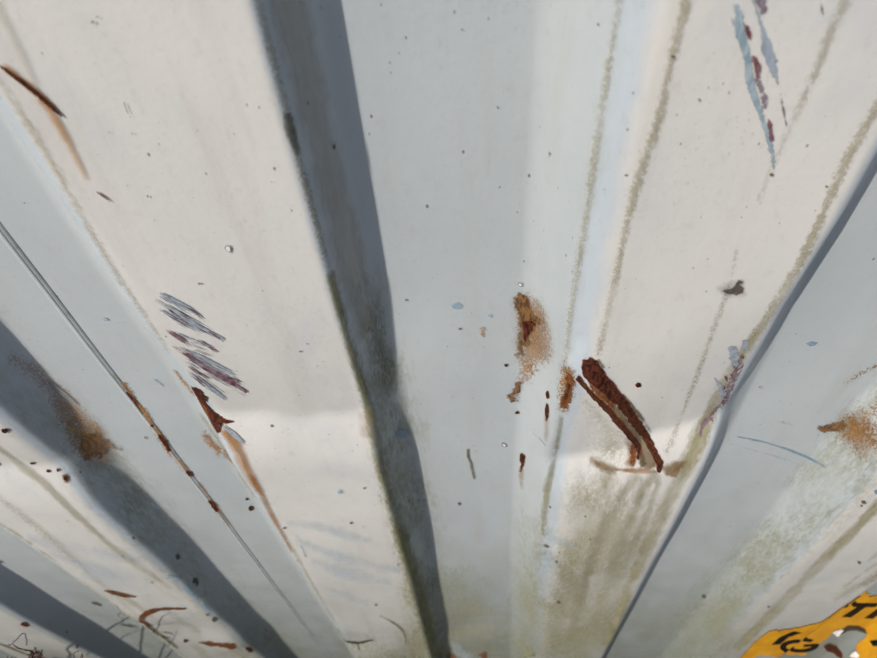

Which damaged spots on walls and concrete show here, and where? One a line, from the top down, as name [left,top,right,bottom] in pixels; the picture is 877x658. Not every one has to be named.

water stain [788,102,877,280]
rust [513,293,540,377]
water stain [738,306,772,361]
rust [49,382,115,460]
rust [121,382,193,476]
rust [507,382,521,414]
rust [545,364,575,421]
water stain [610,404,656,469]
water stain [681,402,716,479]
rust [817,405,877,455]
water stain [820,503,877,559]
rust [138,608,253,653]